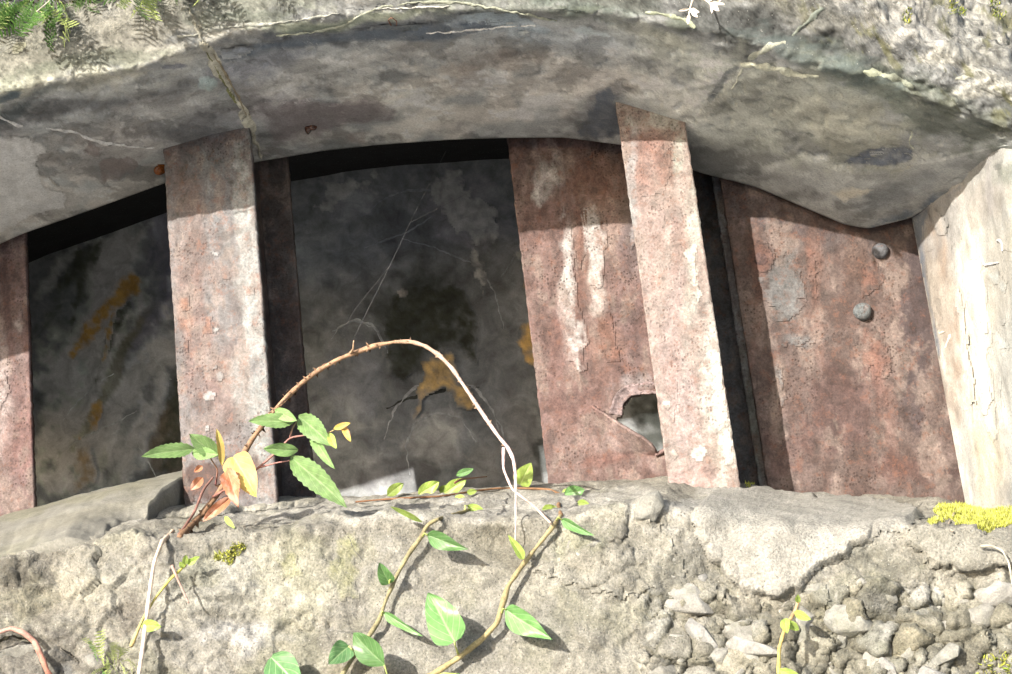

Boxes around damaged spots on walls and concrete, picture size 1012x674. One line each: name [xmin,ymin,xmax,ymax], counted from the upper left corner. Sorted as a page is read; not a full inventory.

crack [177,0,339,159]
crack [0,116,154,149]
rust [626,132,675,196]
rust [570,155,593,269]
rust [595,312,620,362]
rust [922,206,977,422]
rust [186,460,228,504]